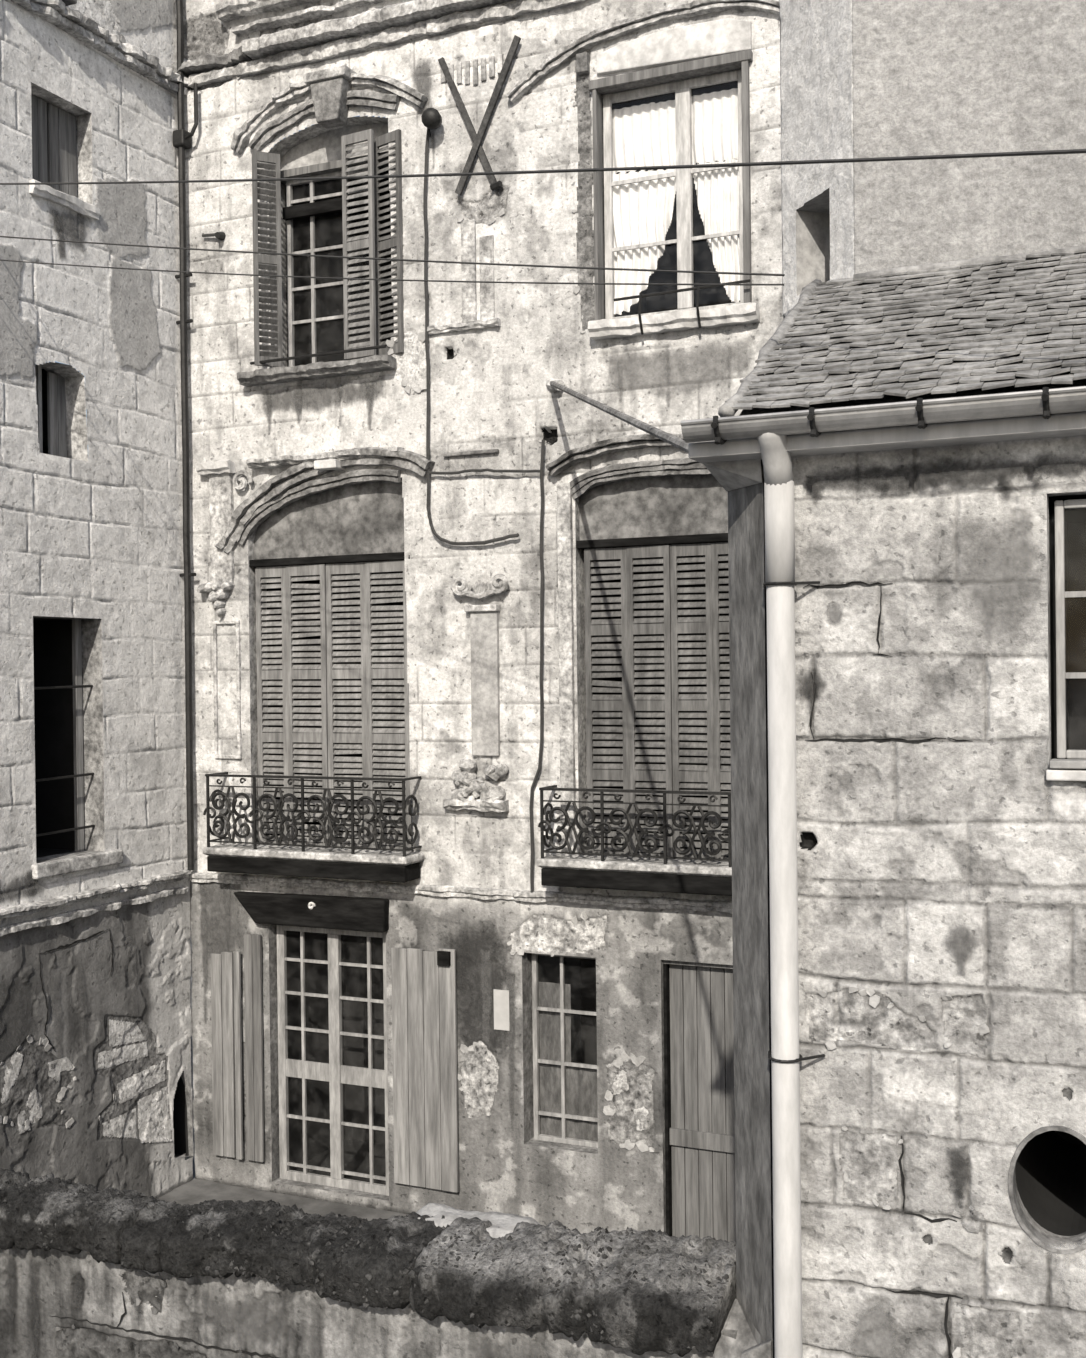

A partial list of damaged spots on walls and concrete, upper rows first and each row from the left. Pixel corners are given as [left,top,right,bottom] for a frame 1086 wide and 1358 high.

peeling [70,0,126,43]
damp [998,478,1009,496]
damp [947,927,974,974]
peeling [0,1035,77,1134]
flaking render [93,1016,172,1143]
peeling [457,1041,499,1118]
peeling [603,1051,655,1152]
crack [51,1292,279,1358]